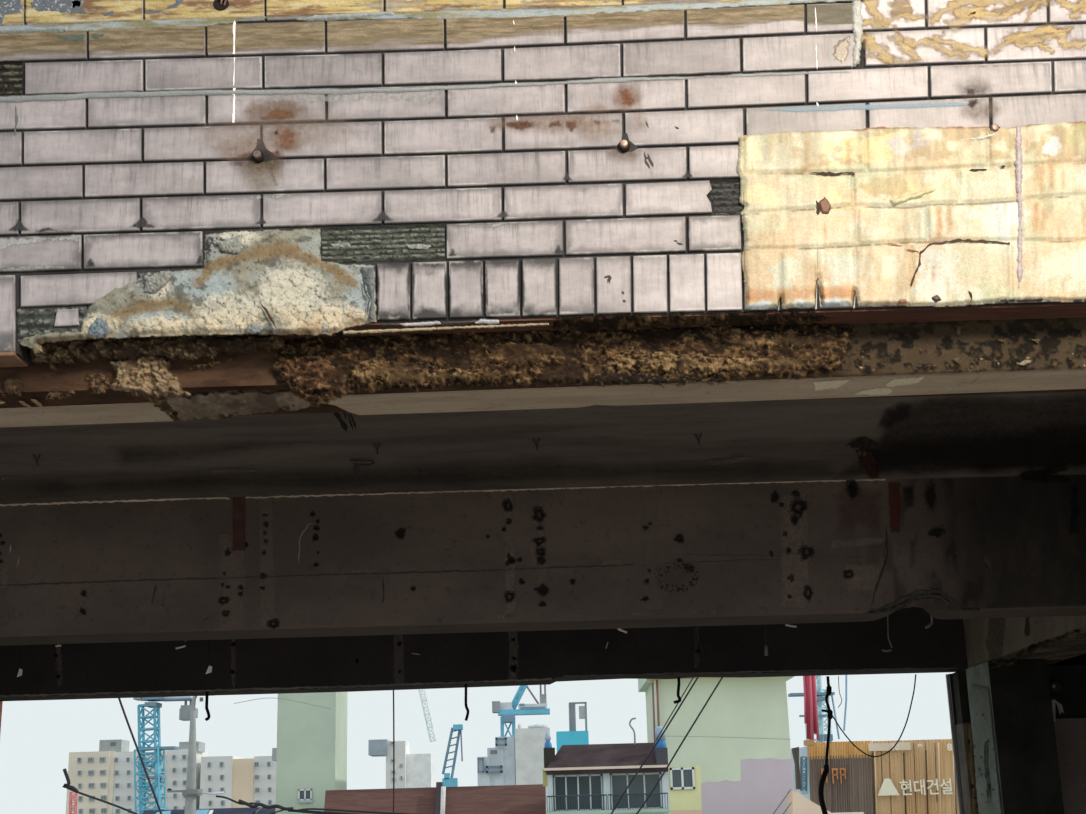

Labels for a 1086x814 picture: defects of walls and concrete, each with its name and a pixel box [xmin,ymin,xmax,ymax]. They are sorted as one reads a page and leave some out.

peeling [0,0,87,33]
peeling [0,61,22,95]
corrosion [618,90,637,105]
corrosion [238,103,297,168]
corrosion [508,120,596,131]
peeling [17,121,1086,421]
crack [888,239,1010,286]
damp [848,399,1086,609]